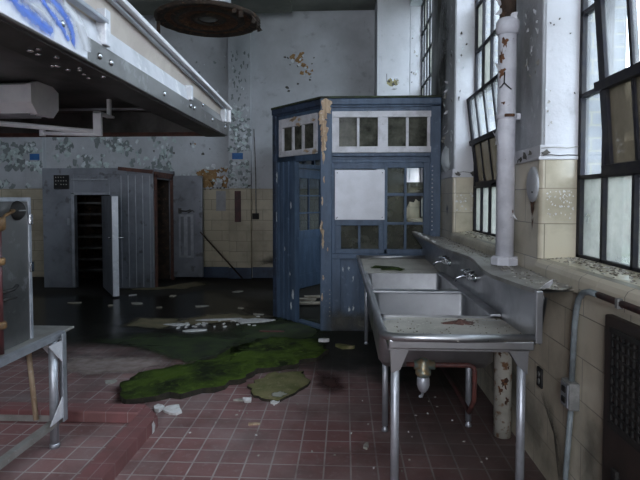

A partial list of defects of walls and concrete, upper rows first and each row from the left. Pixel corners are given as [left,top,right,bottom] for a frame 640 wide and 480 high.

peeling [284,52,315,81]
rust [499,37,509,78]
peeling [52,51,252,190]
peeling [0,141,43,189]